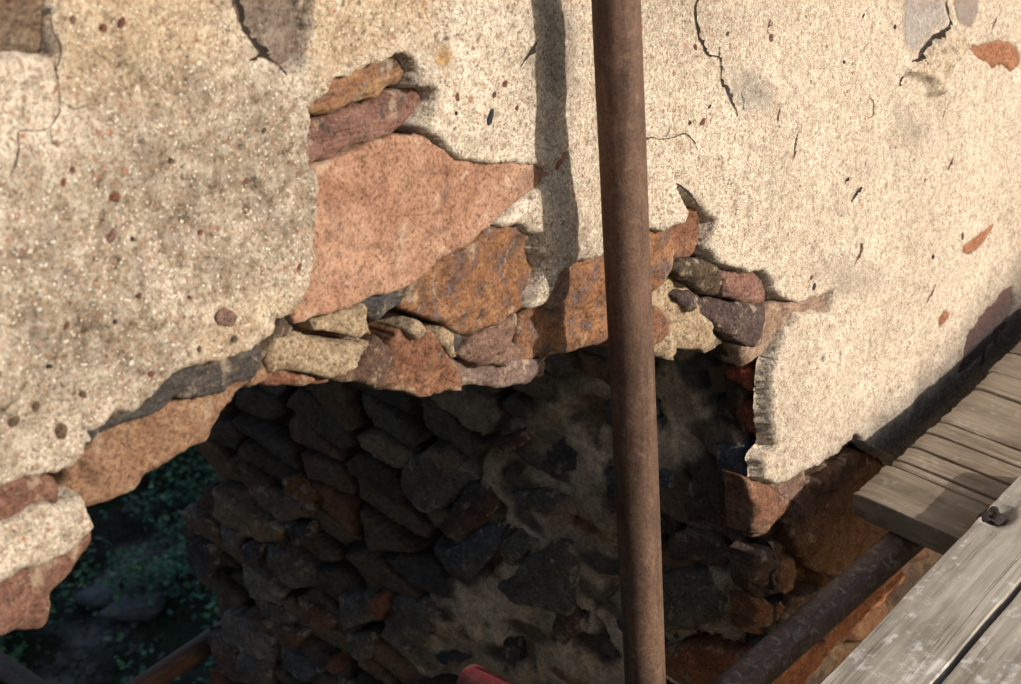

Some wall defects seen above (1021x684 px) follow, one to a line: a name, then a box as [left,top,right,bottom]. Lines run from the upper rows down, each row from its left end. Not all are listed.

crack [10,8,98,178]
crack [695,0,745,117]
crack [912,0,953,64]
flaking render [257,55,608,397]
flaking render [649,206,825,366]